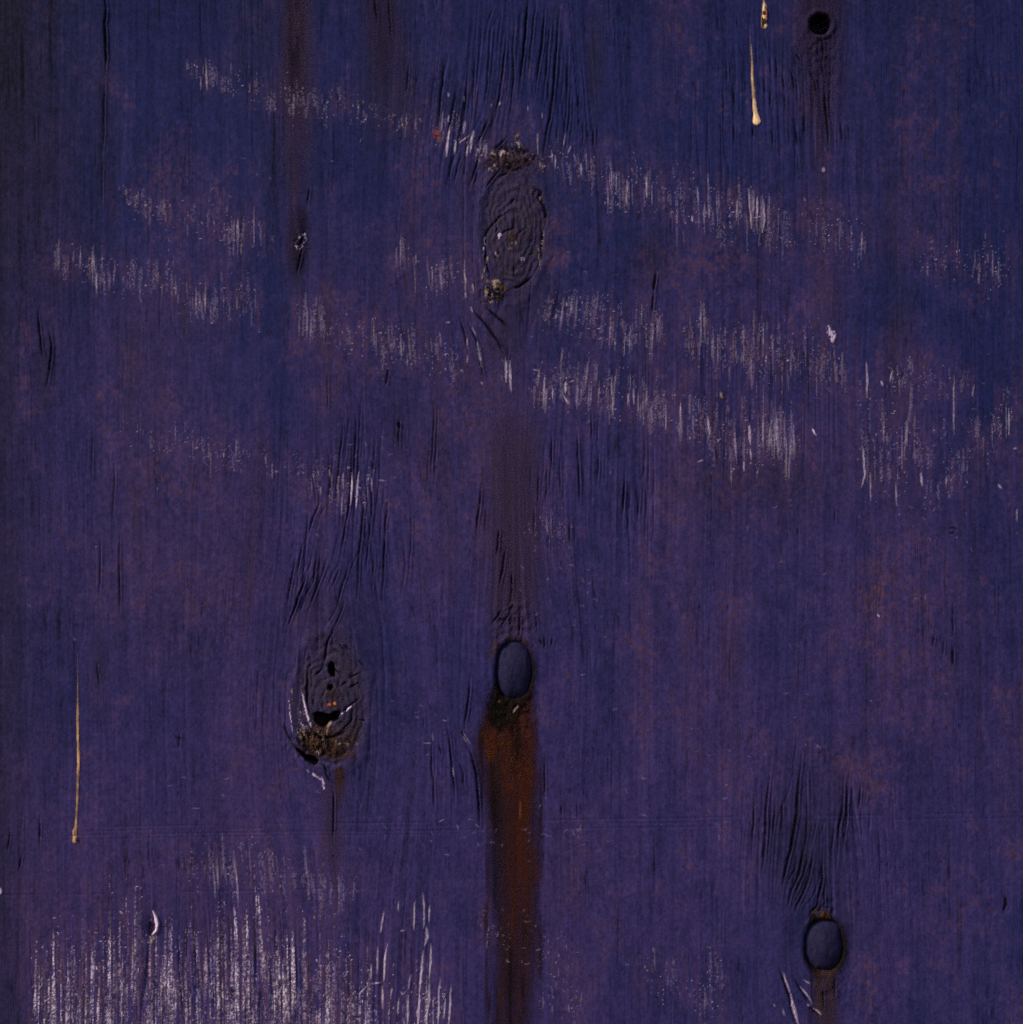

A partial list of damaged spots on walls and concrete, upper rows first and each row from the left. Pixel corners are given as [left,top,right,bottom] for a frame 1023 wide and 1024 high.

corrosion [480,689,541,1024]
crack [752,773,861,911]
peeling [34,932,70,1024]
peeling [84,941,136,1024]
peeling [147,911,198,1024]
peeling [196,897,263,1023]
peeling [265,939,296,1023]
peeling [398,936,451,1024]